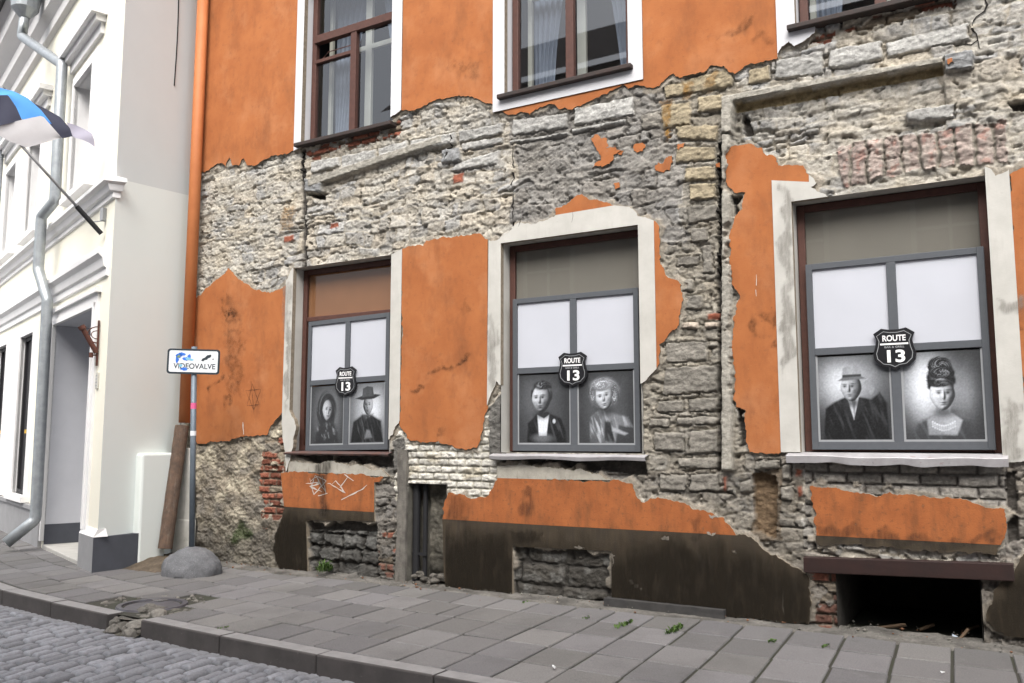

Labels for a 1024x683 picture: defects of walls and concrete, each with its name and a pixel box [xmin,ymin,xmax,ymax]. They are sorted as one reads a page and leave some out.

spalling [180,0,1024,628]
water stain [446,536,510,594]
spalling [981,580,1024,647]